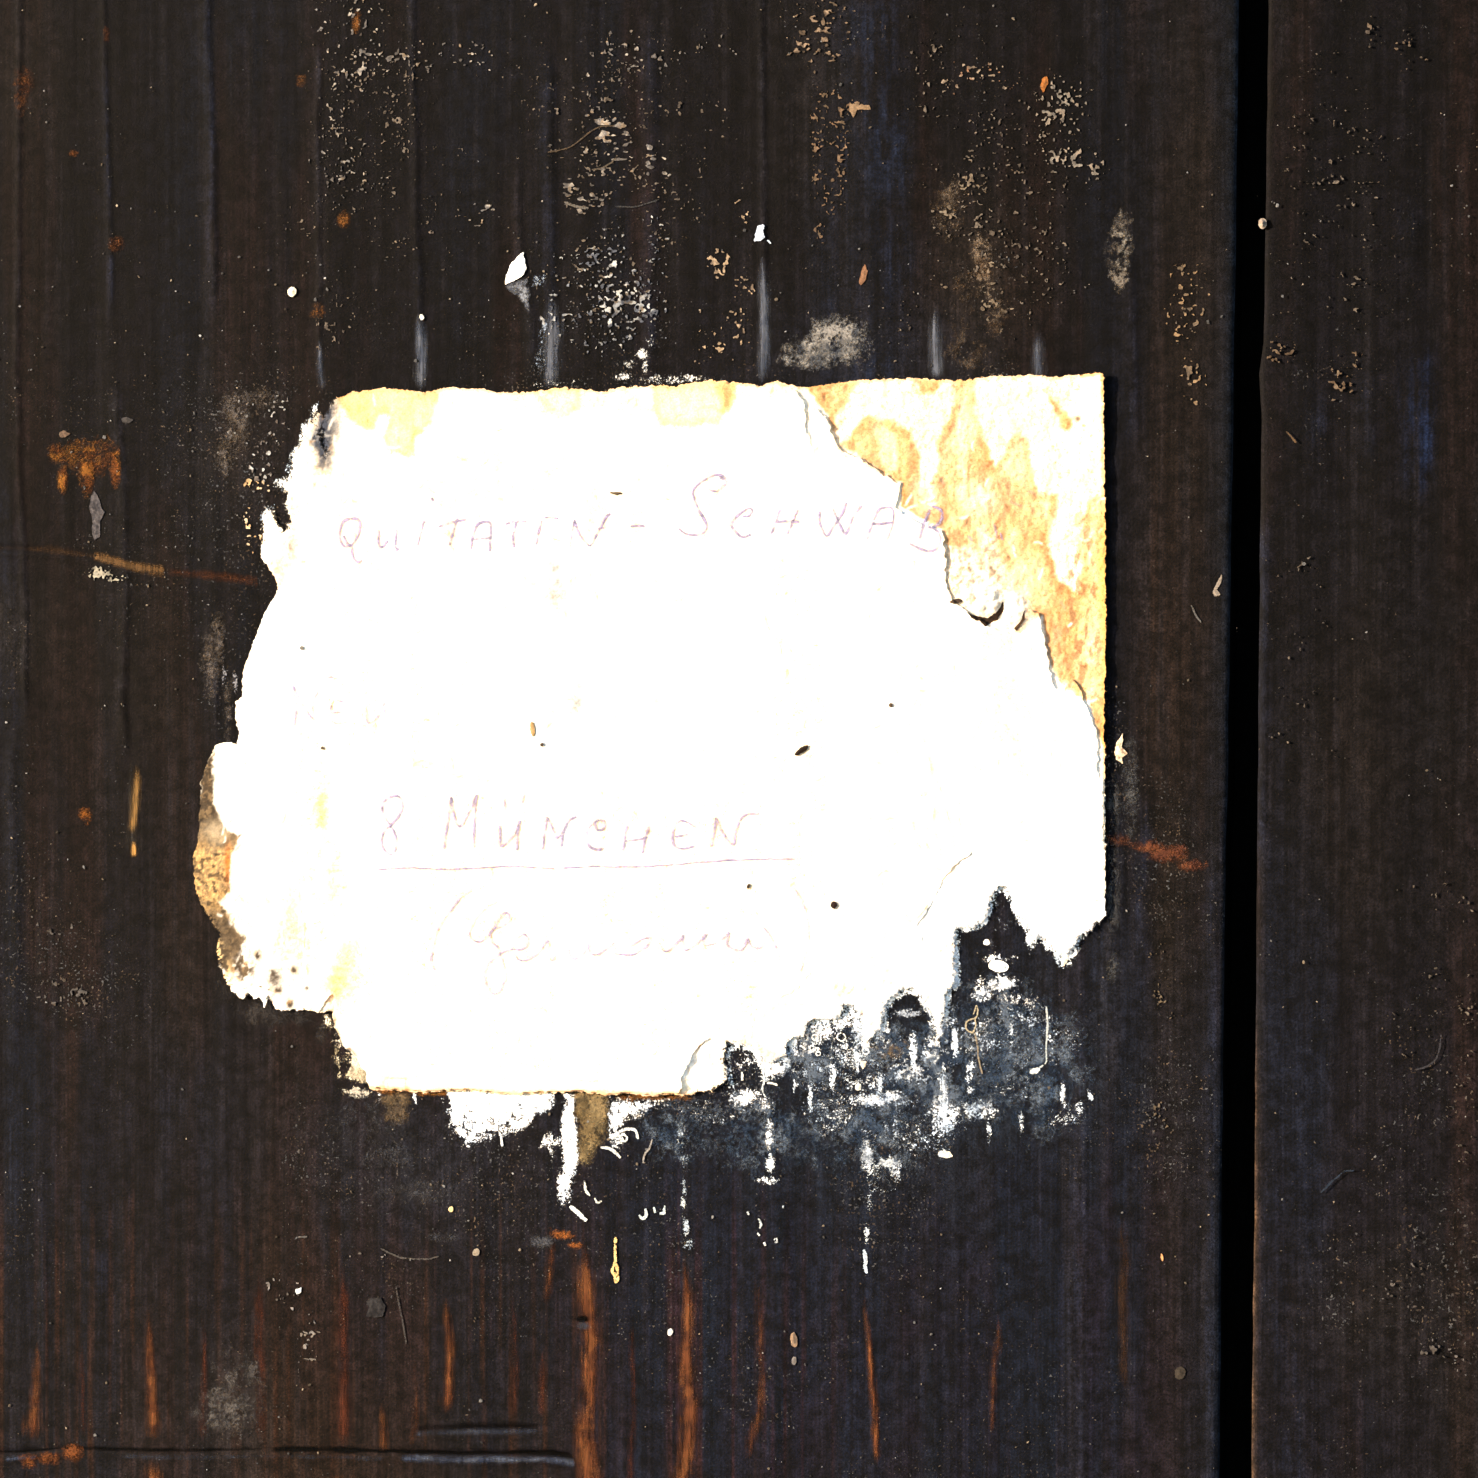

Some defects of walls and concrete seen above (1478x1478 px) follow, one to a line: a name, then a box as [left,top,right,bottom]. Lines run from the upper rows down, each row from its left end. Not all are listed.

peeling [225,395,288,553]
peeling [334,1045,380,1095]
peeling [741,1067,778,1124]
peeling [446,1090,602,1222]
peeling [601,1099,655,1163]